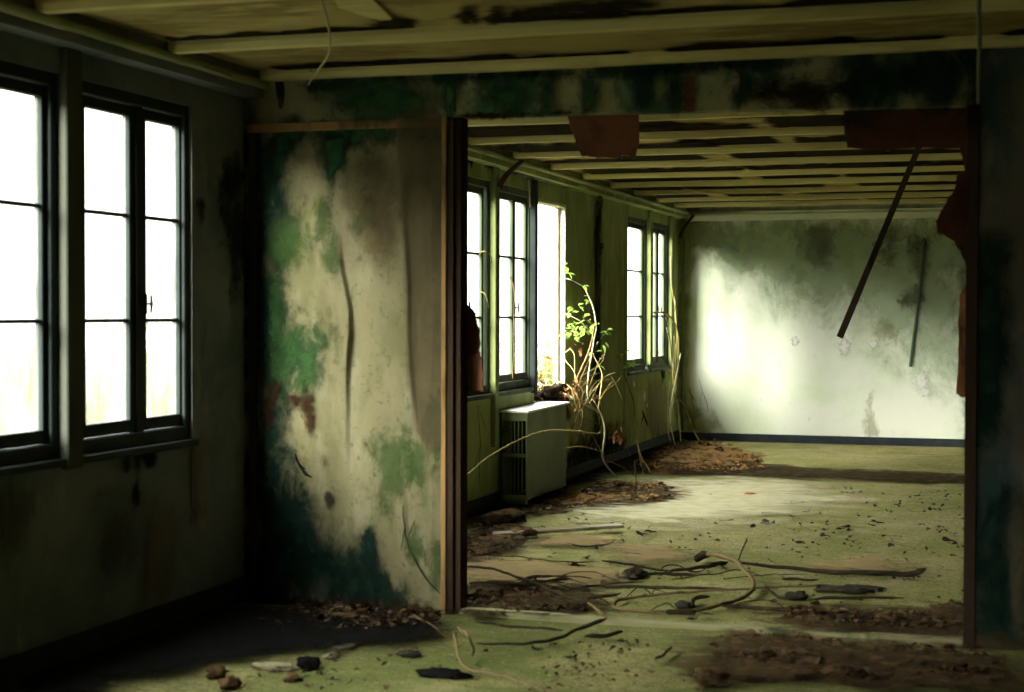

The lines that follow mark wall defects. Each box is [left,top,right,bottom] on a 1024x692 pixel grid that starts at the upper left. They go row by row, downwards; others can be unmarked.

water stain [163,18,416,41]
water stain [453,0,916,27]
water stain [219,36,977,608]
water stain [963,231,1012,448]